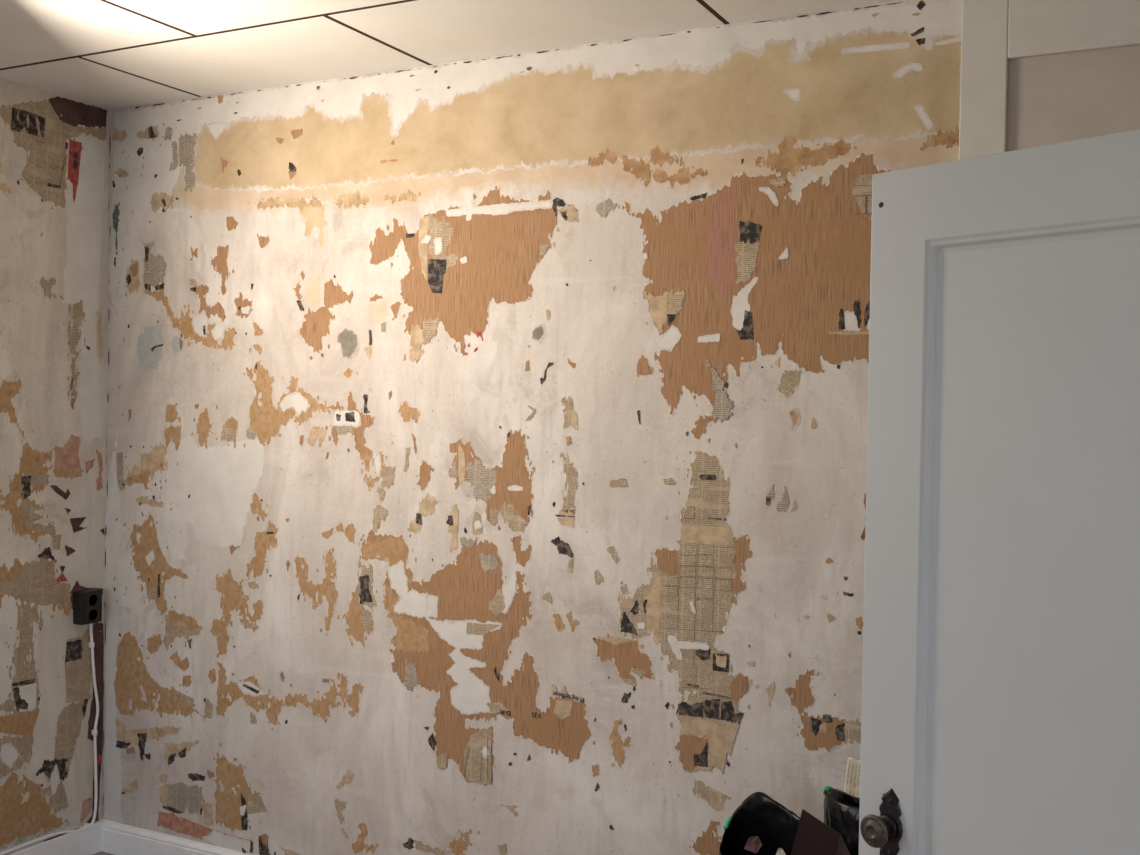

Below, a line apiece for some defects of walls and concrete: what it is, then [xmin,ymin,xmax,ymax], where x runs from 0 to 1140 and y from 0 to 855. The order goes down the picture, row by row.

peeling [365,186,560,363]
peeling [618,152,891,453]
peeling [0,379,25,443]
peeling [157,216,596,788]
peeling [0,558,73,619]
peeling [113,445,365,731]
peeling [592,507,733,691]
peeling [0,766,68,848]
peeling [201,742,267,832]
peeling [592,718,632,791]
peeling [669,704,739,773]
peeling [755,669,861,753]